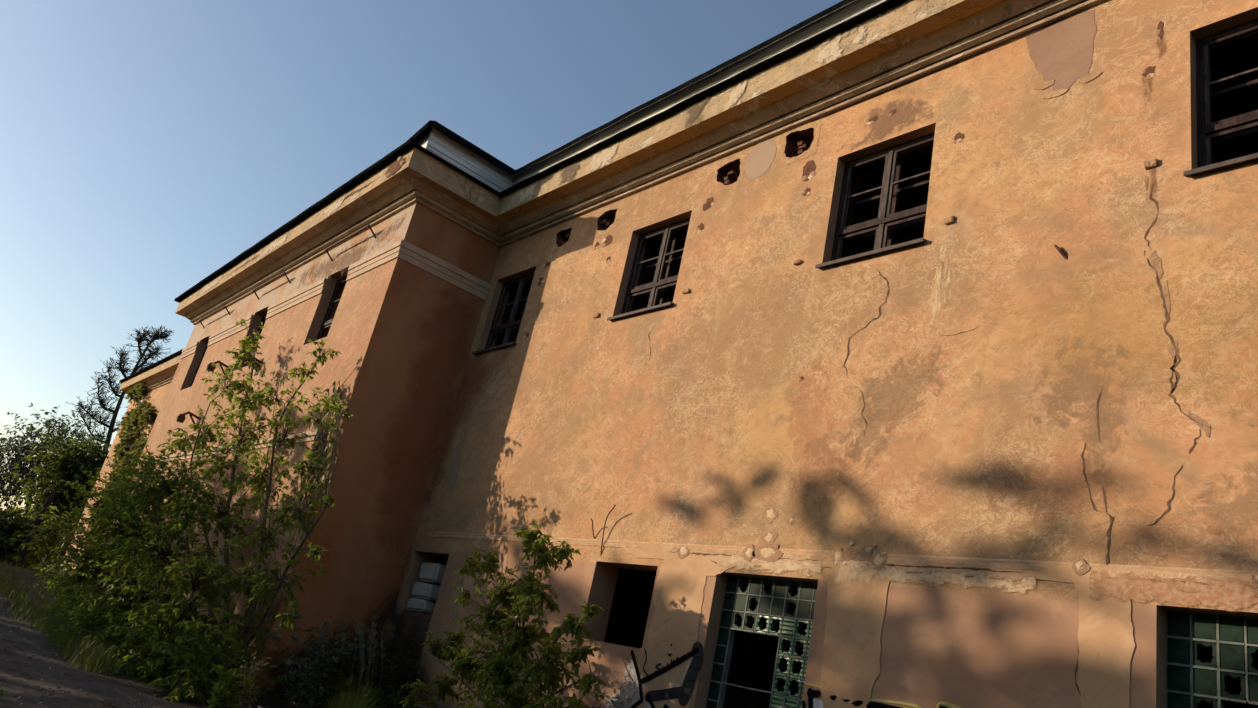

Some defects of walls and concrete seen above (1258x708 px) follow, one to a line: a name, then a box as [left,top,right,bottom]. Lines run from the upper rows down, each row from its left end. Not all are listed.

spalling [536,221,576,286]
spalling [590,202,622,263]
spalling [696,151,748,233]
spalling [776,117,822,197]
crack [843,271,889,435]
crack [1144,180,1213,526]
crack [1081,388,1114,578]
flaking render [618,541,1258,708]
crack [1147,579,1258,598]